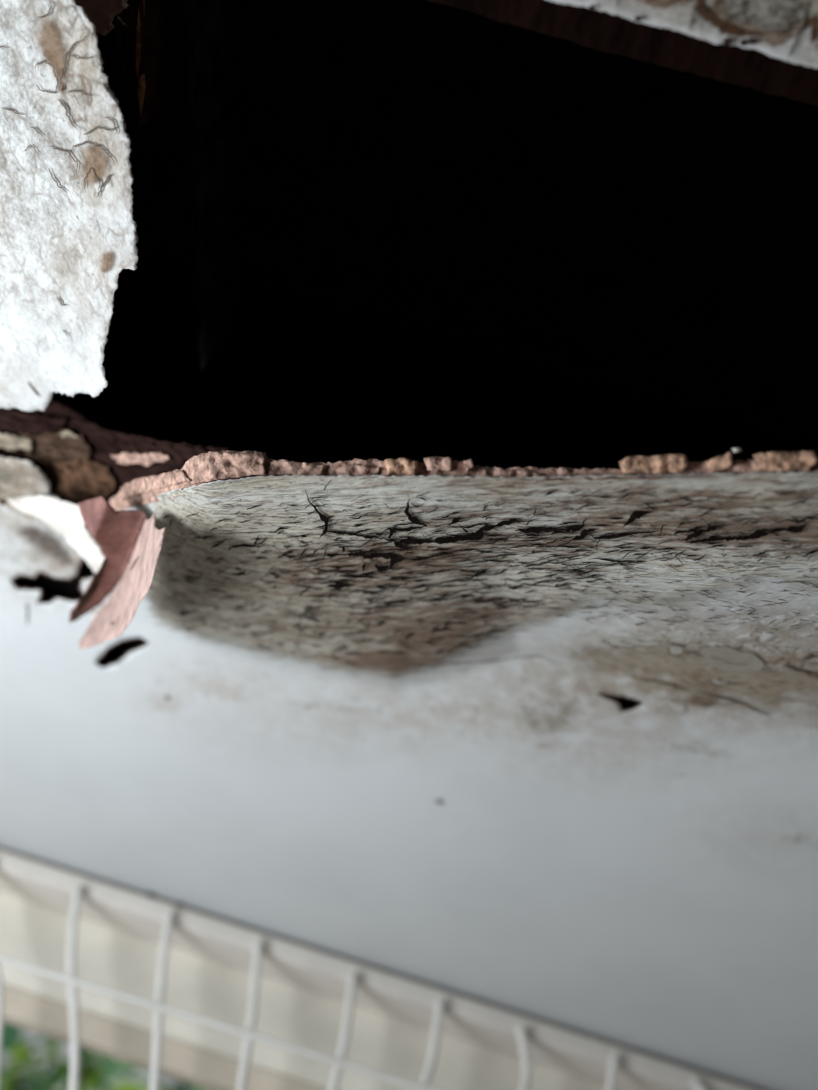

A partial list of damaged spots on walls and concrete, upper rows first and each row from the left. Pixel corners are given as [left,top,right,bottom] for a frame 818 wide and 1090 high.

damp [639,0,818,49]
crack [645,0,815,57]
crack [3,34,118,197]
spalling [7,447,818,650]
crack [158,480,818,666]